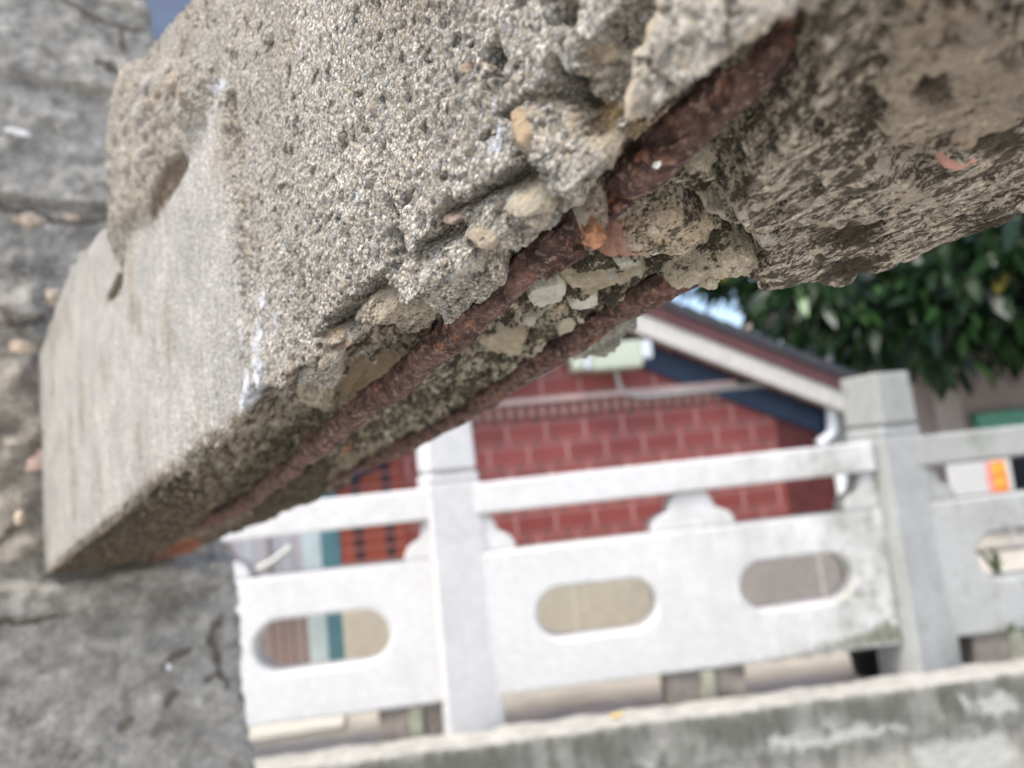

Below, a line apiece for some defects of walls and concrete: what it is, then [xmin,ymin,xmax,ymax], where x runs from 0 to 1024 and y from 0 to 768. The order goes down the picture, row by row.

rust [149,9,799,562]
spalling [142,0,843,562]